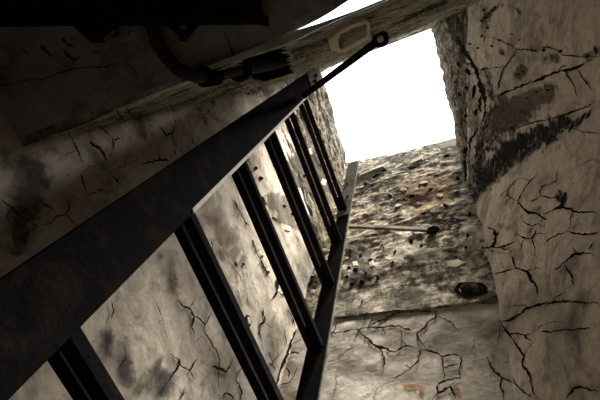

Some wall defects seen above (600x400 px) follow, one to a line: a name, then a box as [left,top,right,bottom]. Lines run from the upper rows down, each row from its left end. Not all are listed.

crack [0,37,143,86]
crack [2,105,196,240]
leakage [370,69,591,217]
crack [455,36,598,183]
leakage [382,241,467,310]
crack [328,160,599,400]
crack [177,298,243,400]